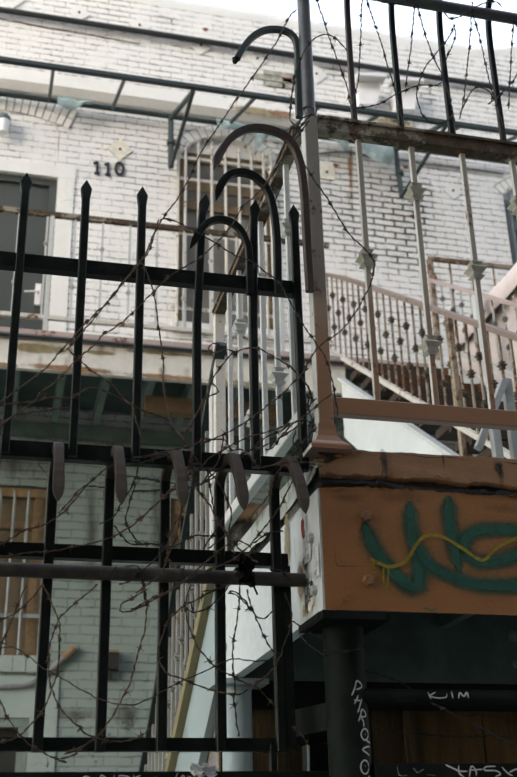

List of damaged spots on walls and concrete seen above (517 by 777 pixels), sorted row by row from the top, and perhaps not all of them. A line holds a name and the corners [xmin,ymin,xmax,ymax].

crack [318,452,517,498]